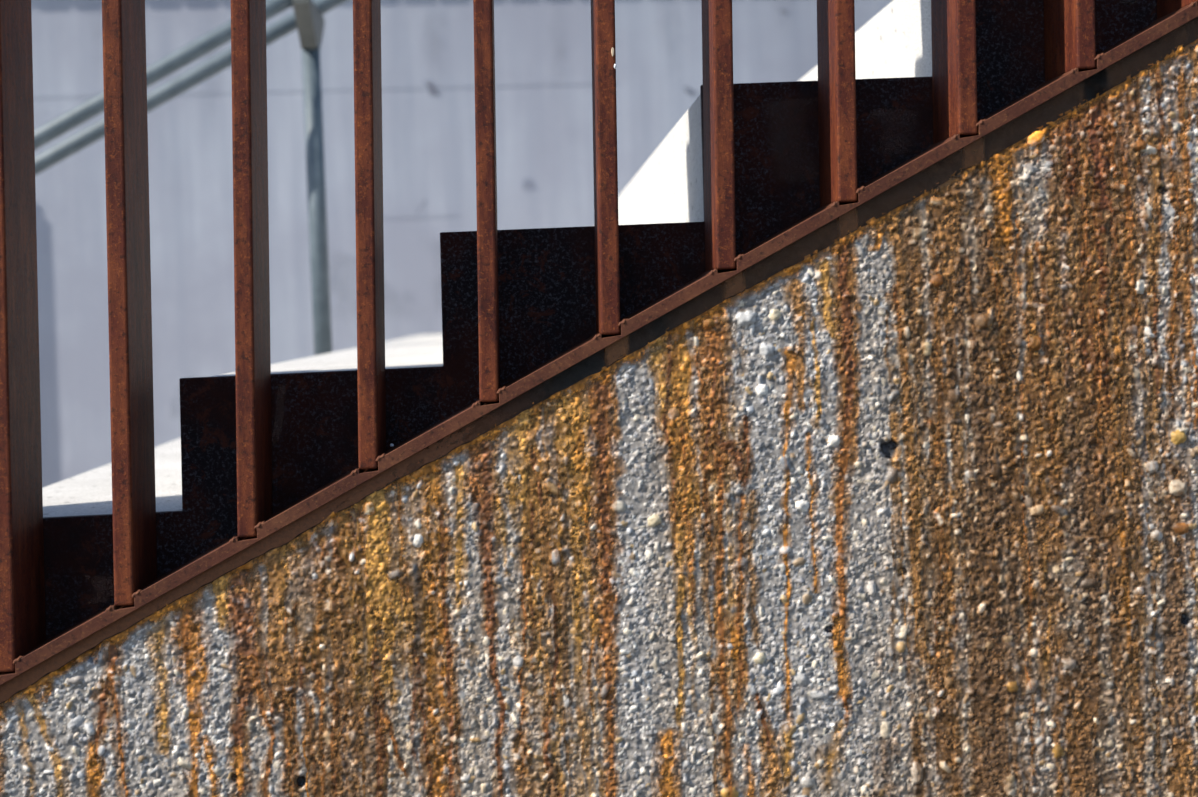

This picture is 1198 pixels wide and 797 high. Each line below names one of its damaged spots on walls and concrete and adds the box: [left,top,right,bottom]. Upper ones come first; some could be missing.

corrosion [1146,67,1173,353]
corrosion [1165,61,1198,412]
corrosion [782,278,810,456]
corrosion [1159,414,1184,479]
corrosion [0,584,208,797]
corrosion [513,664,531,777]
corrosion [675,574,685,725]
corrosion [747,693,792,797]
corrosion [782,470,791,713]
corrosion [913,718,926,797]
corrosion [930,421,965,797]
corrosion [1150,472,1198,797]